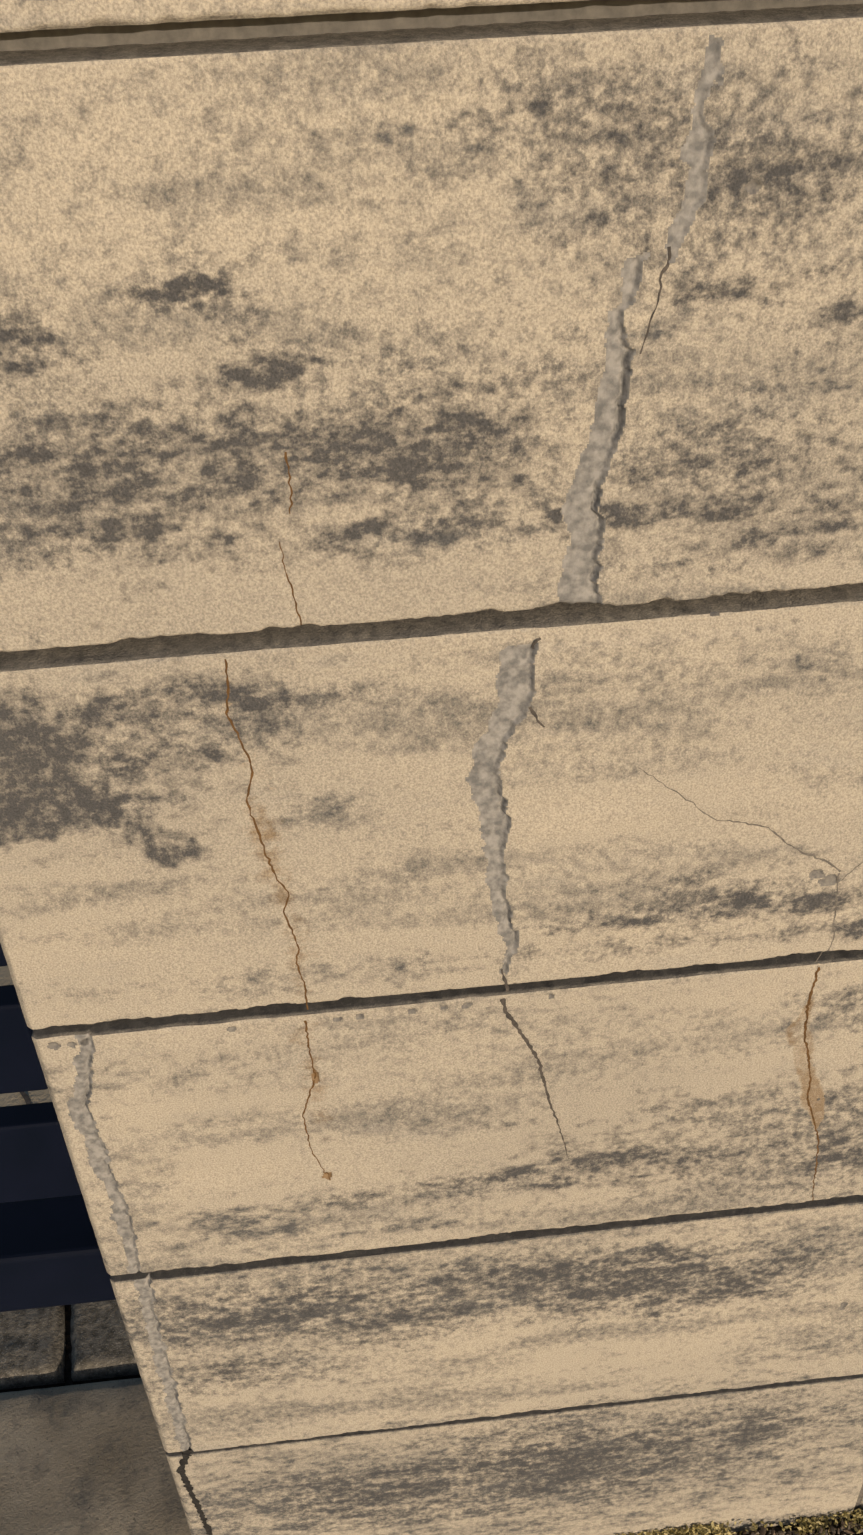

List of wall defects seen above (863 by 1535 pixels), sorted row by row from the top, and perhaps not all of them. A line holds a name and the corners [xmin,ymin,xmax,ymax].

crack [20,1033,212,1535]
damp [0,651,405,903]
crack [224,659,331,1180]
corrosion [234,750,343,1145]
crack [279,452,302,625]
damp [0,18,863,652]
crack [465,637,569,1159]
crack [557,35,725,605]
crack [639,768,863,1201]
corrosion [784,997,825,1129]